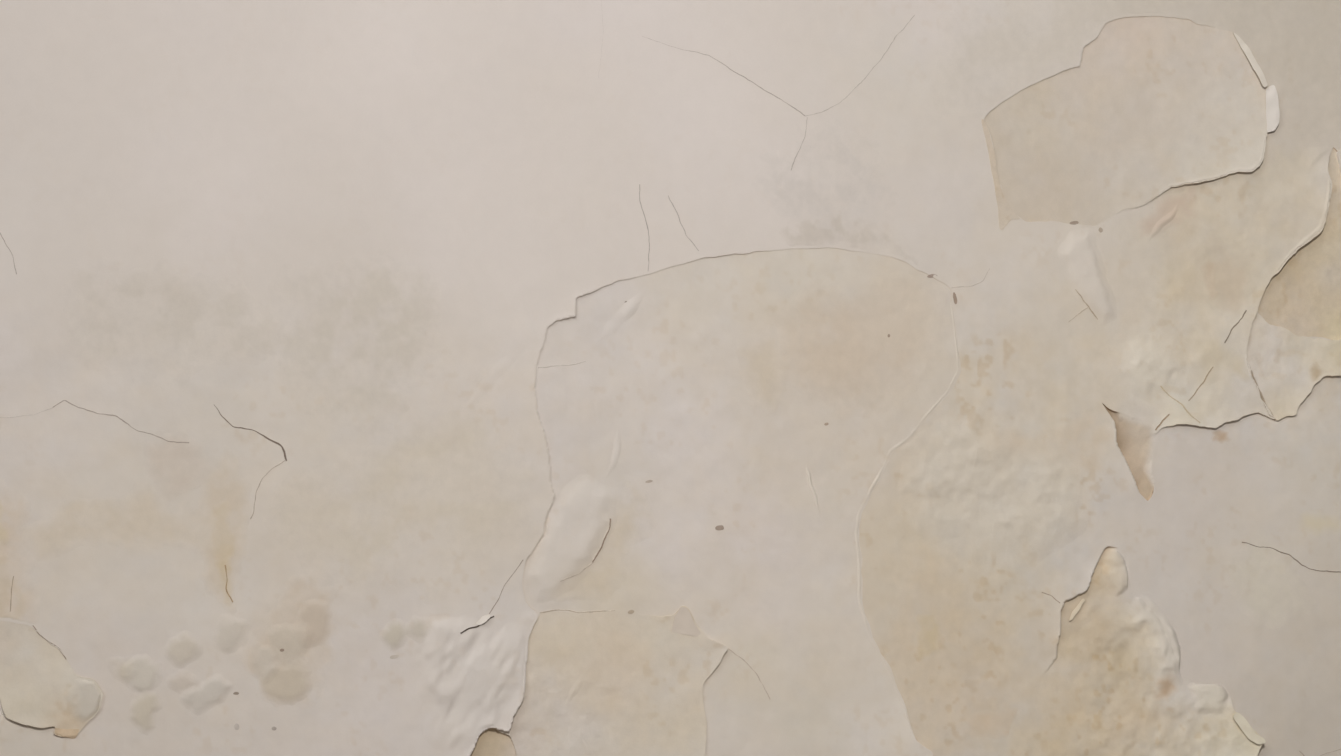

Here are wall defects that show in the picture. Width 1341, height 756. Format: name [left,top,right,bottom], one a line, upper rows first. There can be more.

crack [642,15,915,171]
crack [639,184,699,271]
peeling [981,16,1341,434]
crack [0,400,189,443]
crack [214,404,288,519]
crack [9,576,67,660]
crack [224,565,234,602]
crack [540,519,615,613]
peeling [471,606,728,756]
peeling [1001,547,1265,756]
crack [1242,541,1341,573]